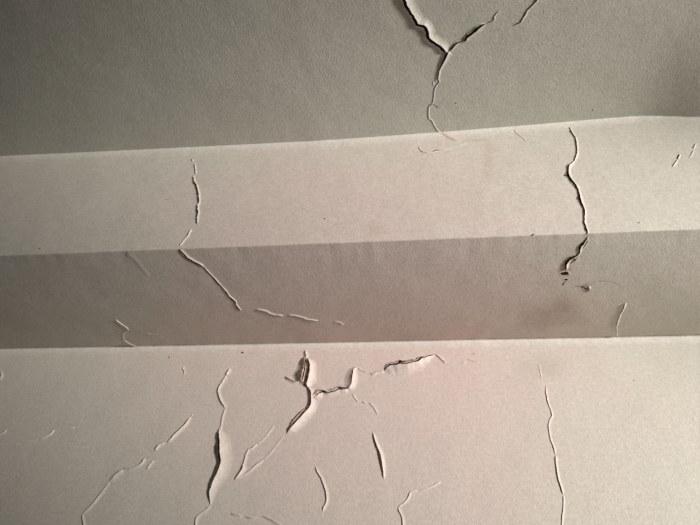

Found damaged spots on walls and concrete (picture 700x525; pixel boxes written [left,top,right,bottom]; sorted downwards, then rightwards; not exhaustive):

crack [400,0,500,132]
crack [512,0,539,26]
crack [180,159,344,325]
crack [558,127,590,286]
crack [81,414,193,525]
peeling [194,368,234,525]
peeling [285,350,479,434]
crack [398,482,441,525]
crack [539,364,566,525]